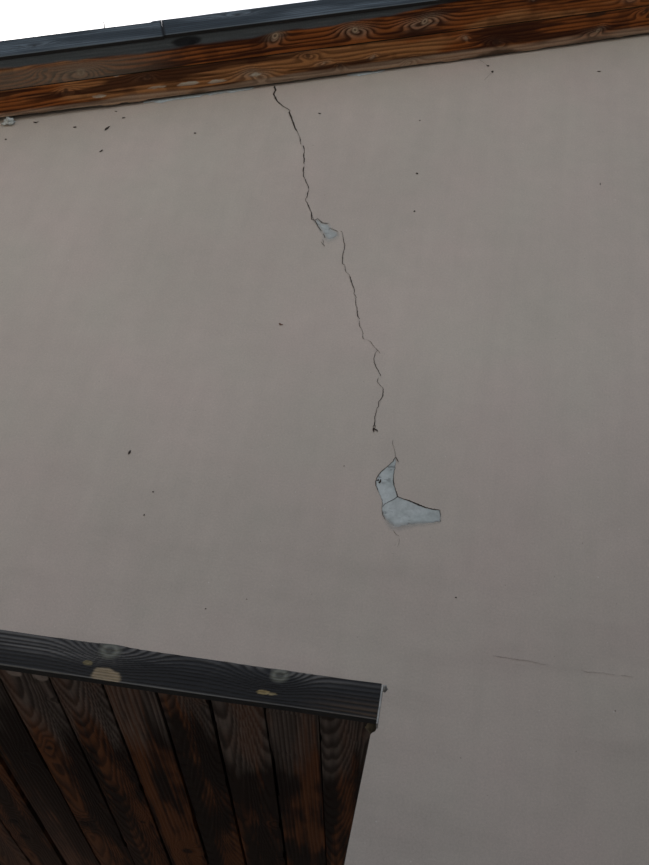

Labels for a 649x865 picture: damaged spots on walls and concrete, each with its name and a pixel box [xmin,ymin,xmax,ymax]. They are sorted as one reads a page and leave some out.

crack [273,86,396,457]
peeling [375,457,441,526]